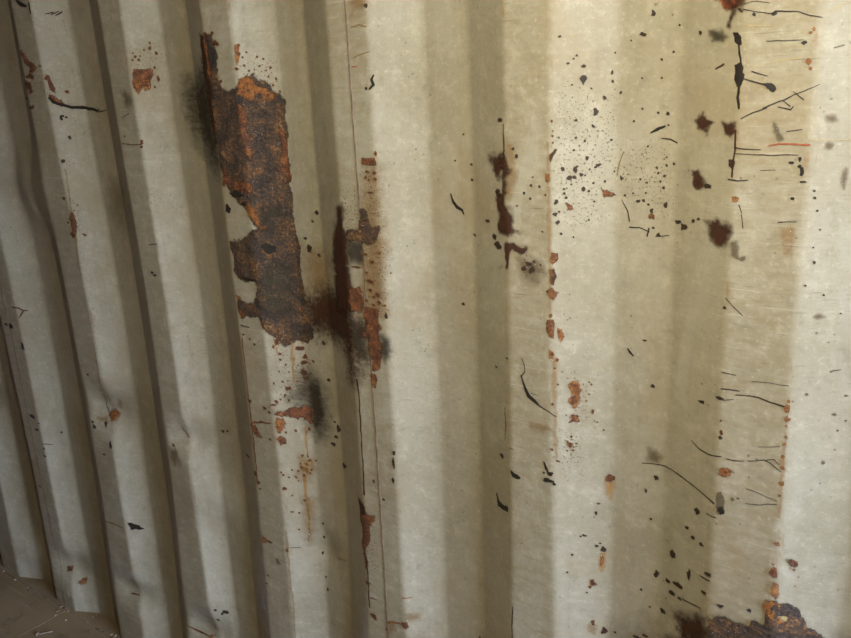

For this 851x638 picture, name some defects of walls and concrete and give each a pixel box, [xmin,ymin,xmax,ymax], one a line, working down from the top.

corrosion [131,42,160,94]
corrosion [486,118,559,300]
corrosion [523,64,675,235]
corrosion [693,170,711,189]
corrosion [675,218,745,261]
corrosion [695,115,736,177]
corrosion [203,31,392,620]
corrosion [546,314,564,341]
corrosion [660,563,823,638]